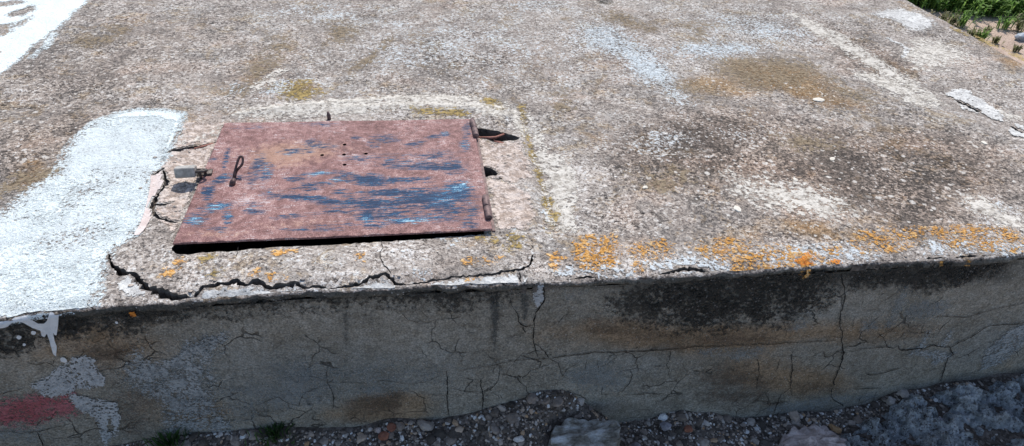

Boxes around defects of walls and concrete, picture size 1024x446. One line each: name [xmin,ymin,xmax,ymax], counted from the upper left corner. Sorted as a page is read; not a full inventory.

crack [108,238,1021,415]
damp [549,237,1024,356]